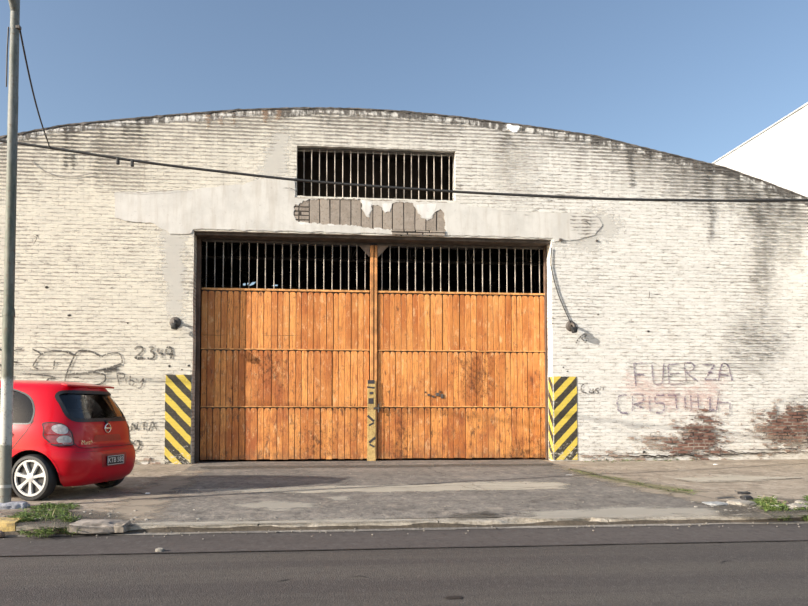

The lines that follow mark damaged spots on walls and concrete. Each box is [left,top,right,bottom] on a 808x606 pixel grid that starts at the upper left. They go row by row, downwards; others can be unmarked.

spalling [294,197,447,236]
damp [536,128,808,323]
peeling [579,391,808,461]